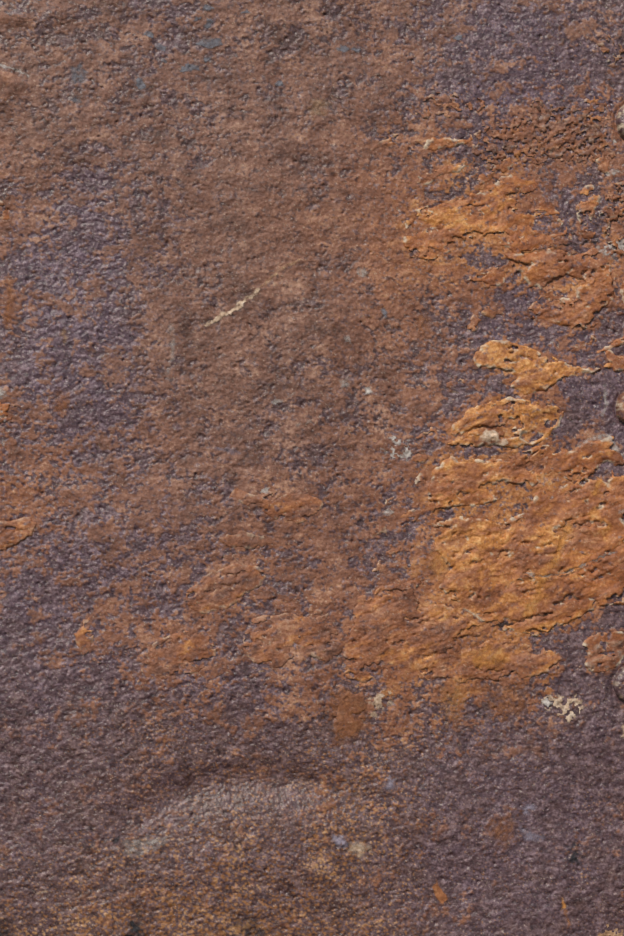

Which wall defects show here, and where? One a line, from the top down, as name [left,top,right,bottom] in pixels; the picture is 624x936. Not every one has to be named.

rust [229,92,624,740]
spalling [481,430,508,446]
rust [0,517,37,551]
rust [184,564,266,614]
rust [74,617,94,655]
rust [137,631,216,682]